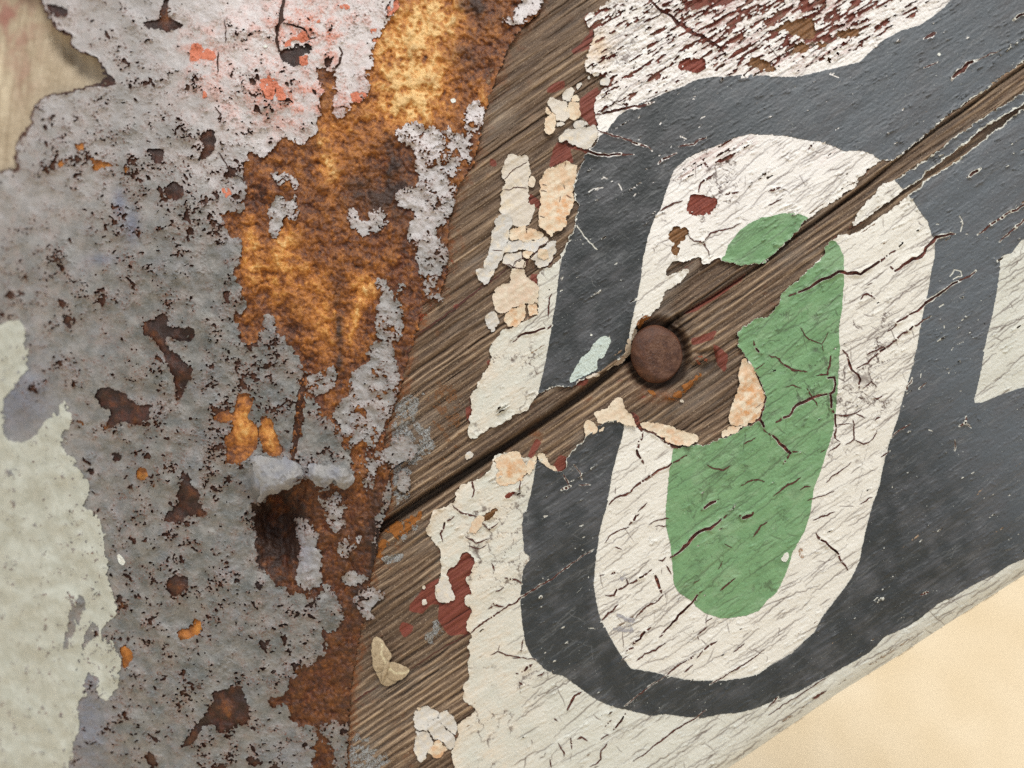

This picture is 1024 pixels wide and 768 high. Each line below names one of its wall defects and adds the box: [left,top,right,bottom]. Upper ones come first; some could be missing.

peeling [678,57,706,73]
crack [924,51,999,80]
peeling [544,72,610,149]
peeling [476,154,577,332]
crack [789,233,954,299]
crack [979,203,1024,241]
rust [214,0,541,768]
peeling [584,397,699,446]
peeling [722,358,765,438]
crack [410,271,976,768]
peeling [422,576,455,605]
peeling [413,706,457,762]